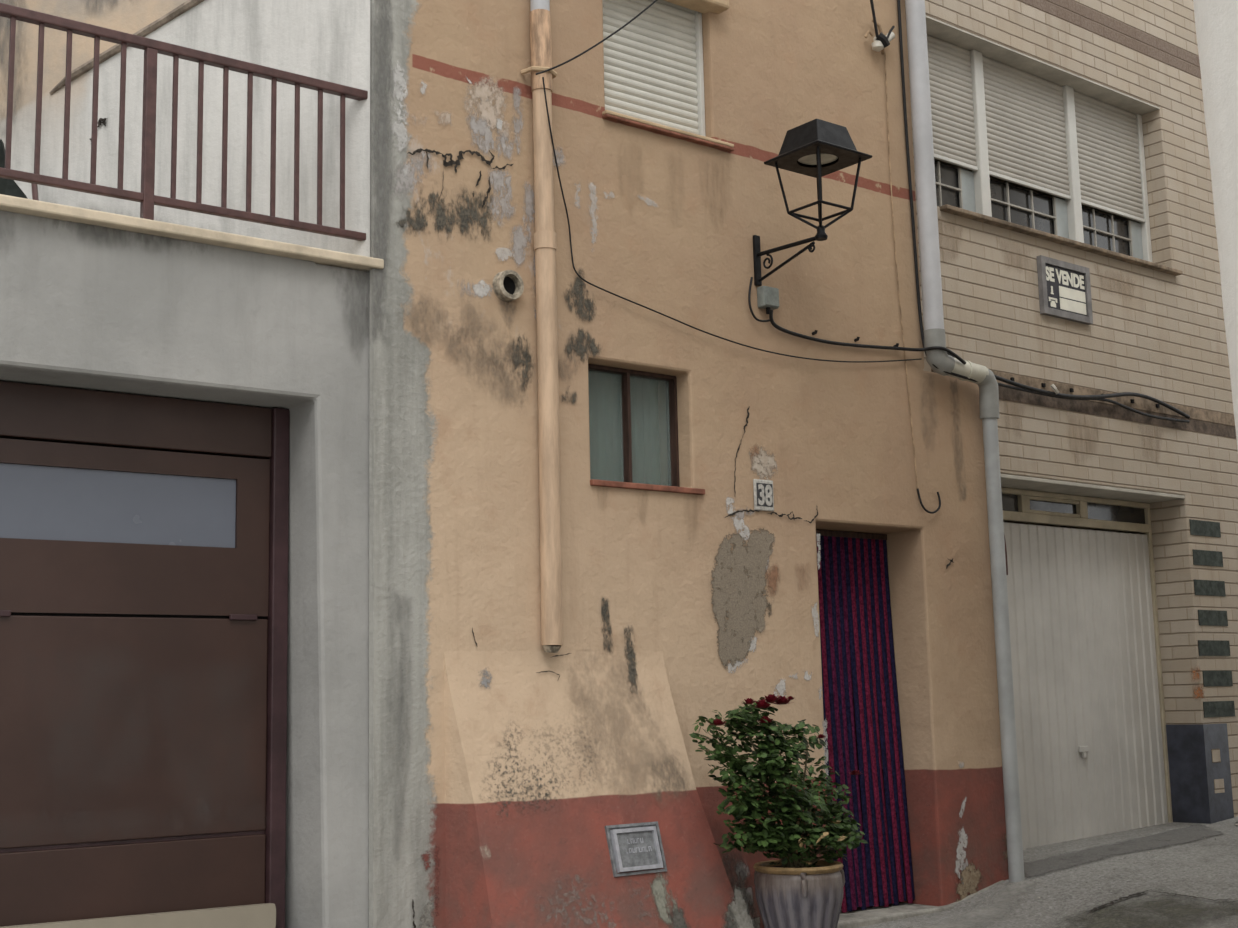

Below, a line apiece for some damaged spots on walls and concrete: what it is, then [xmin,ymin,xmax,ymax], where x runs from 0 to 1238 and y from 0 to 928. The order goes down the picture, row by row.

peeling [391,63,430,194]
water stain [351,0,493,339]
crack [407,148,513,208]
peeling [465,78,535,276]
water stain [450,336,533,397]
water stain [558,270,599,377]
crack [725,406,818,523]
spalling [711,497,775,673]
water stain [601,598,637,692]
water stain [489,734,552,815]
spalling [724,855,760,928]
spalling [955,798,982,902]